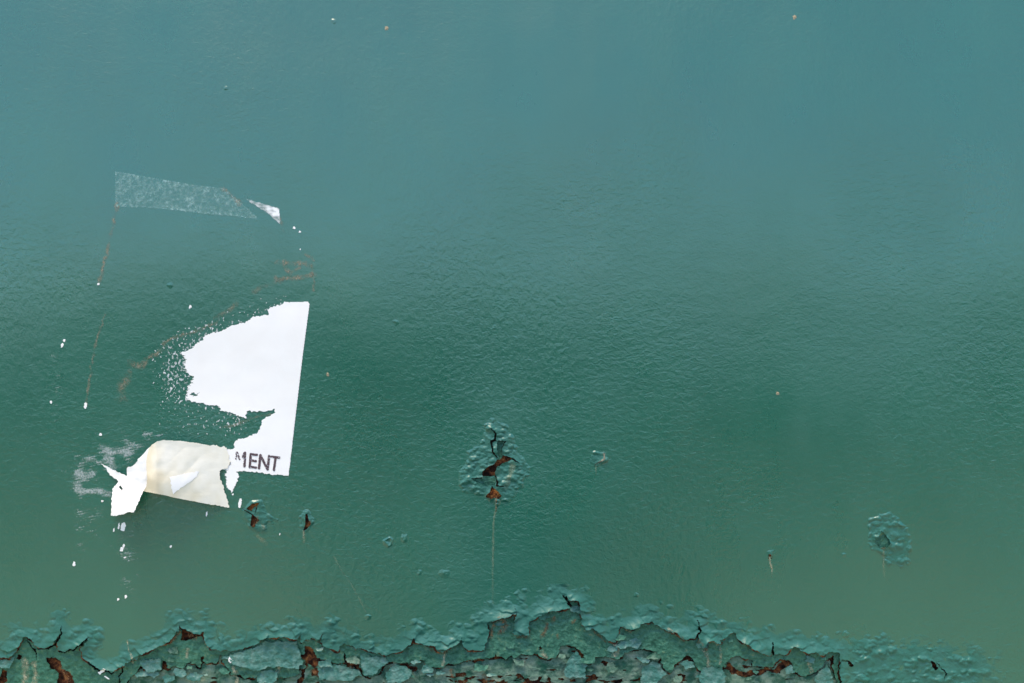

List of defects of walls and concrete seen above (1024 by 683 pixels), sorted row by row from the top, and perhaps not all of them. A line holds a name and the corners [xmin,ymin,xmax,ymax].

corrosion [458,418,531,509]
peeling [0,584,843,683]